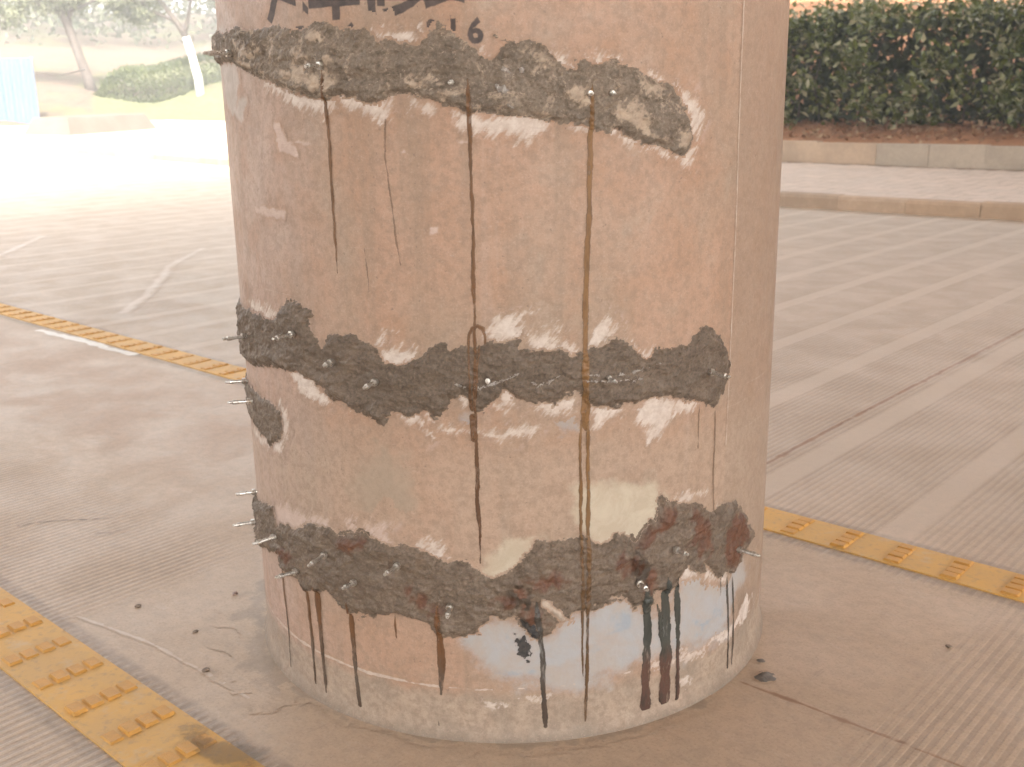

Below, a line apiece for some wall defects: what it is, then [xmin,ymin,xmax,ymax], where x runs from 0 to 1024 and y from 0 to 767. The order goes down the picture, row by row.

peeling [231,31,267,77]
peeling [278,21,346,100]
peeling [376,63,448,100]
peeling [471,96,554,123]
peeling [506,40,693,156]
rust [320,70,338,274]
rust [466,78,486,564]
rust [578,84,595,722]
rust [301,586,327,693]
rust [345,604,362,707]
rust [434,605,446,695]
spalling [541,599,569,622]